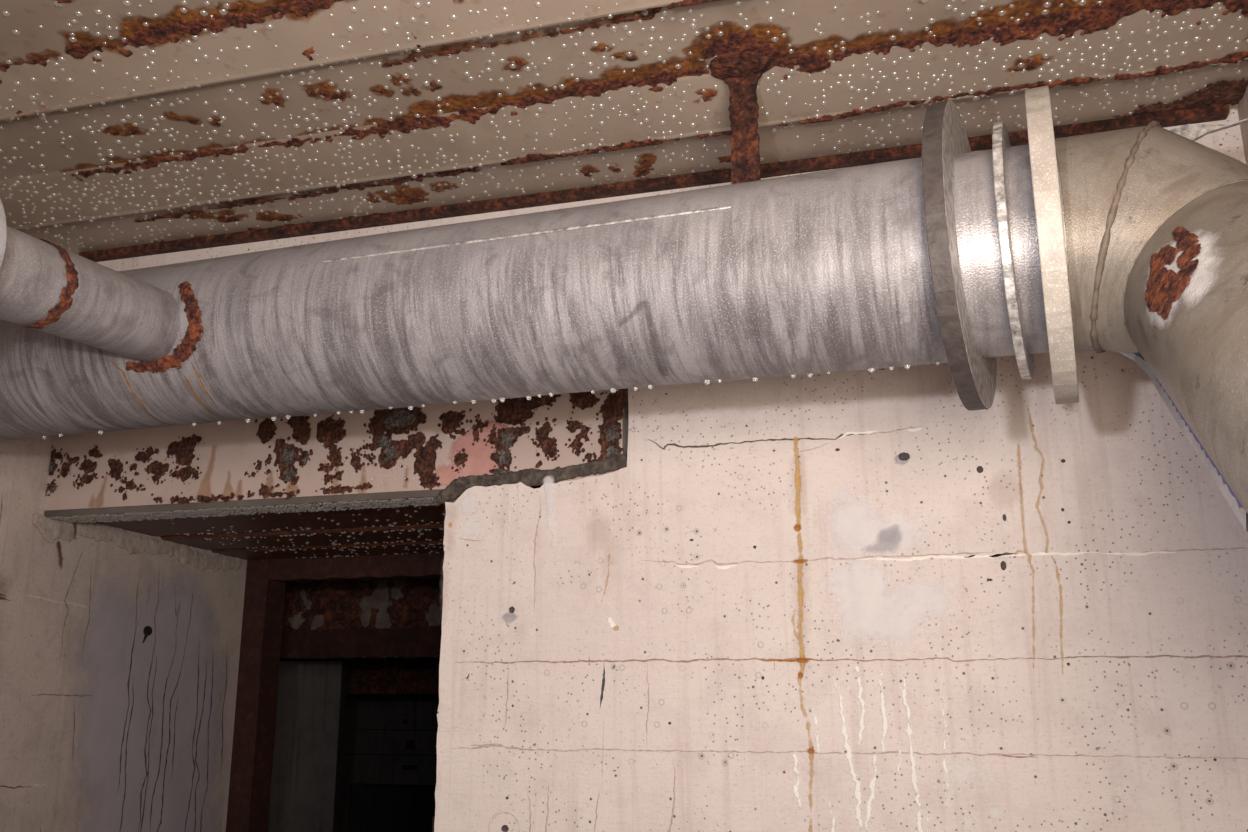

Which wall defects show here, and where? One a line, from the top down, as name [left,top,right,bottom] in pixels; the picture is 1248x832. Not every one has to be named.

corrosion [0,0,347,83]
corrosion [63,0,1248,186]
corrosion [134,165,485,231]
spalling [436,421,627,503]
crack [648,426,924,452]
crack [533,494,541,610]
crack [637,547,1248,569]
corrosion [1015,418,1063,660]
corrosion [792,438,814,807]
crack [457,655,1248,707]
crack [451,743,1248,759]
leakage [832,666,929,832]